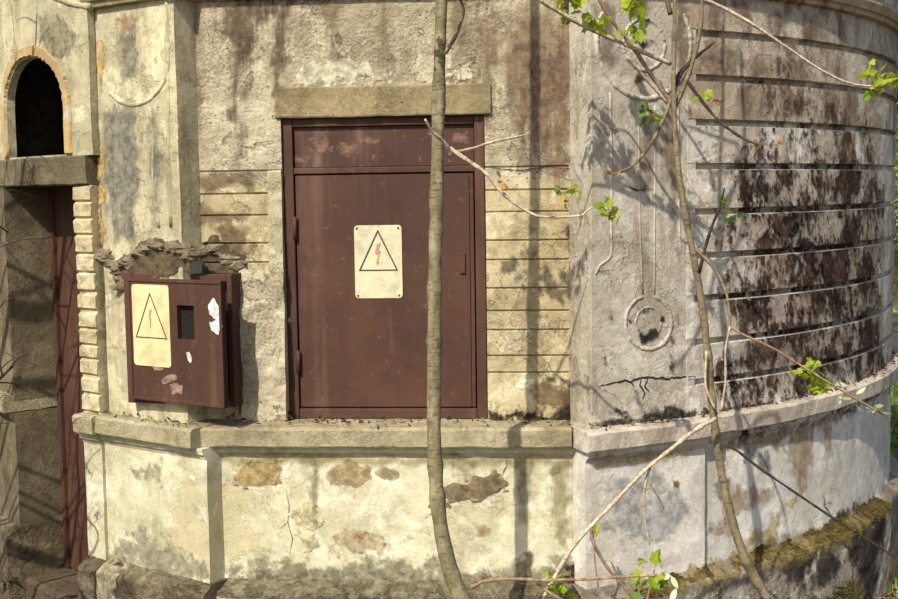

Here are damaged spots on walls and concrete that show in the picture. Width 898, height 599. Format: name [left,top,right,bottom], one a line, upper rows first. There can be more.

damp [220,0,289,96]
damp [103,106,139,242]
spalling [120,237,190,279]
damp [199,208,245,256]
spalling [202,234,248,273]
damp [700,44,891,412]
crack [597,376,695,399]
peeling [232,458,283,489]
peeling [325,458,399,487]
spalling [444,469,508,508]
damp [706,478,773,535]
damp [767,498,892,599]